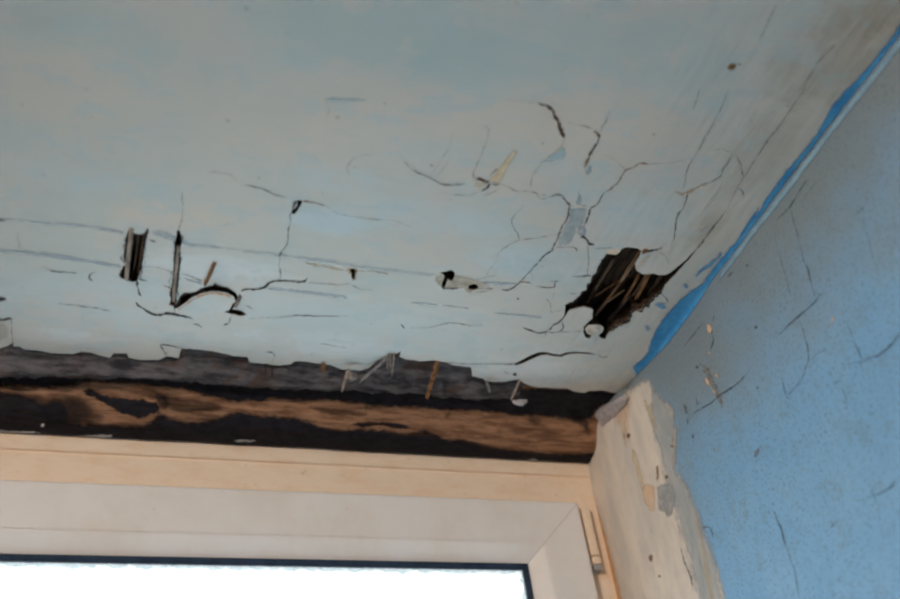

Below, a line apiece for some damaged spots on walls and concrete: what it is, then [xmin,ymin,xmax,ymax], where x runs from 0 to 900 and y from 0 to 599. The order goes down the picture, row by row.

hole [119,227,156,296]
spalling [169,197,184,315]
crack [136,172,338,327]
peeling [436,270,486,292]
crack [403,46,834,397]
hole [564,247,698,339]
spalling [0,317,529,406]
damp [0,377,615,463]
peeling [632,450,675,516]